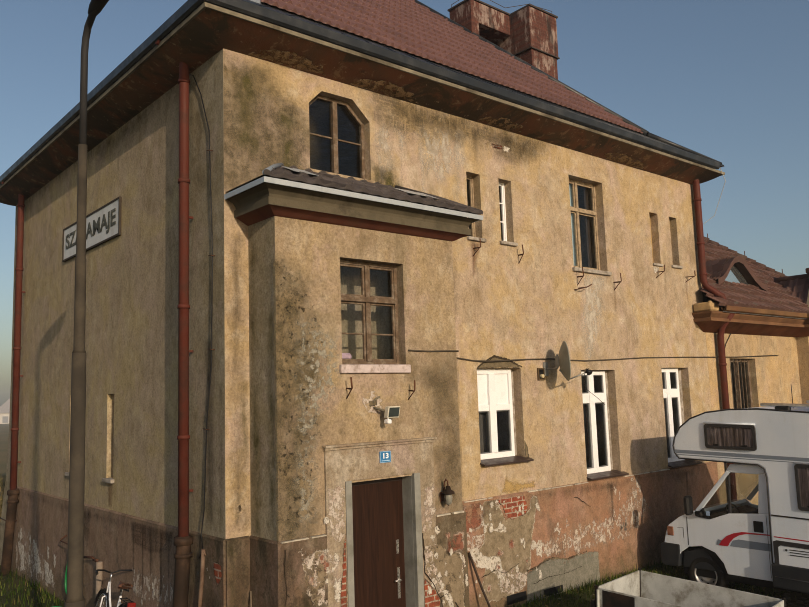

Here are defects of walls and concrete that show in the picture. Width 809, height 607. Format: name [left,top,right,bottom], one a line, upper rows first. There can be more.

damp [271,262,335,540]
peeling [15,528,56,587]
flaking render [301,486,347,607]
peeling [423,477,650,607]